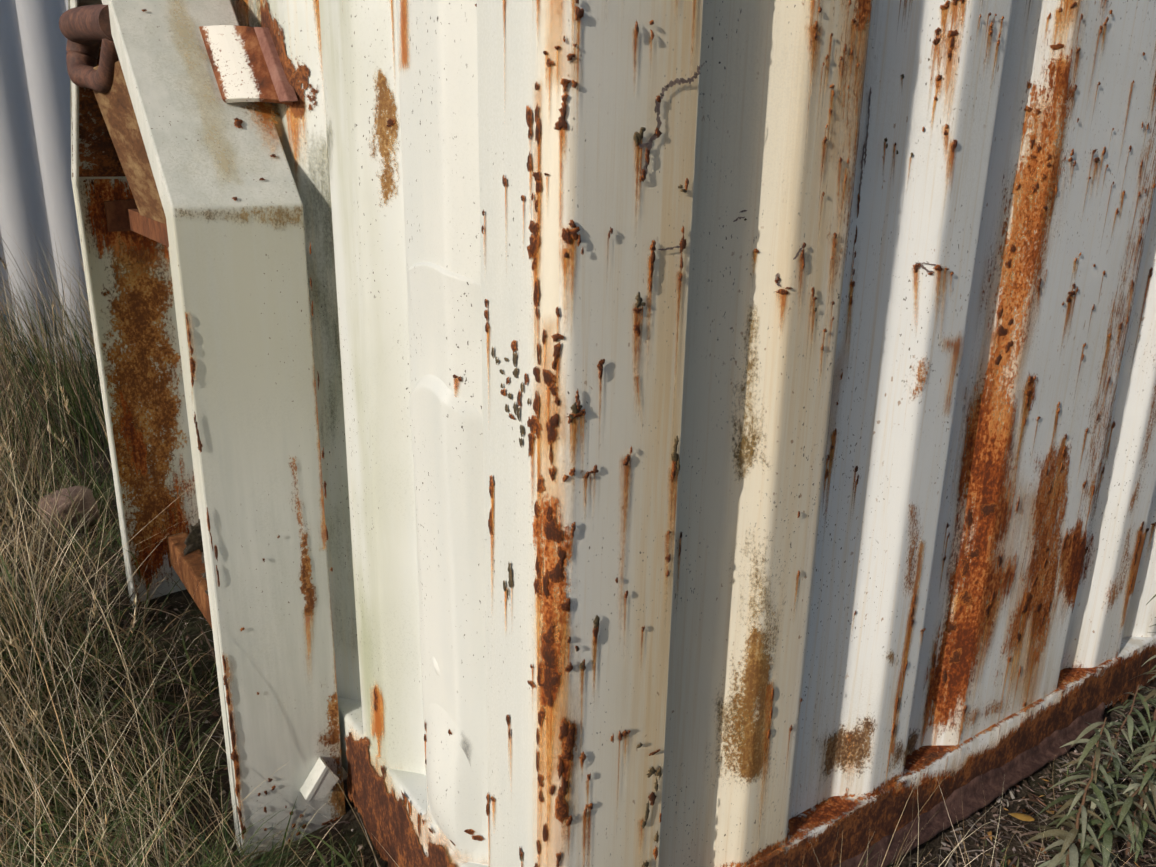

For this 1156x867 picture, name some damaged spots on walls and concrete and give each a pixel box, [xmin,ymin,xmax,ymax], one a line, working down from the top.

corrosion [372,70,399,204]
crack [638,65,700,182]
corrosion [72,87,220,603]
corrosion [289,371,328,660]
corrosion [503,562,513,615]
corrosion [519,0,600,867]
corrosion [615,446,633,629]
corrosion [633,240,656,361]
corrosion [665,436,682,577]
corrosion [717,0,1156,867]
corrosion [222,655,246,840]
corrosion [486,793,496,852]